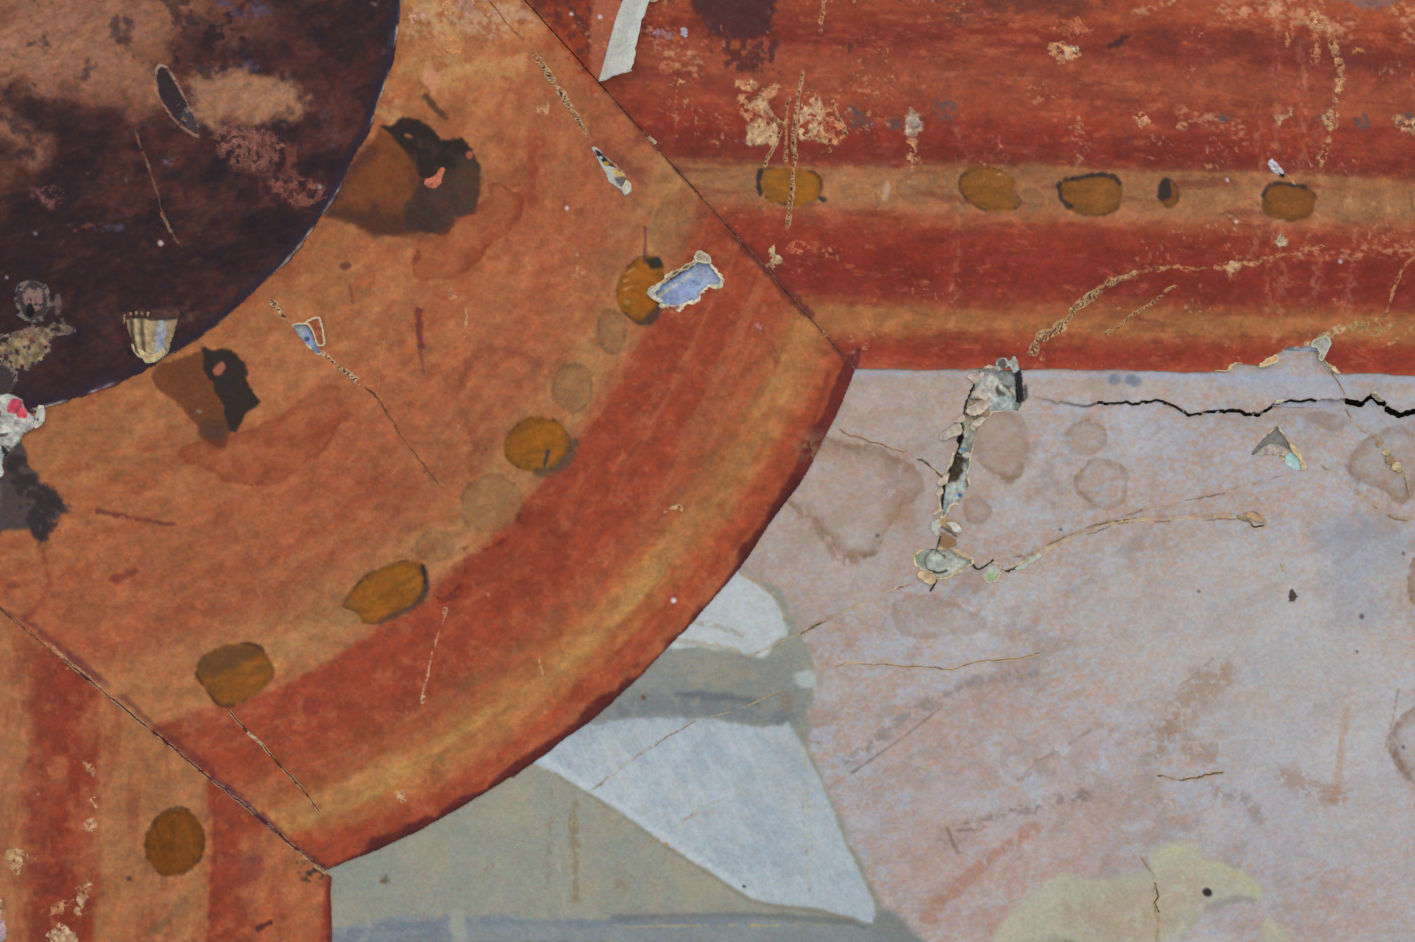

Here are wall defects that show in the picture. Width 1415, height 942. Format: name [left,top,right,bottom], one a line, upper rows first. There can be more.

peeling [598,0,687,82]
peeling [647,250,724,312]
peeling [0,394,45,477]
crack [1086,360,1415,521]
peeling [912,547,1015,592]